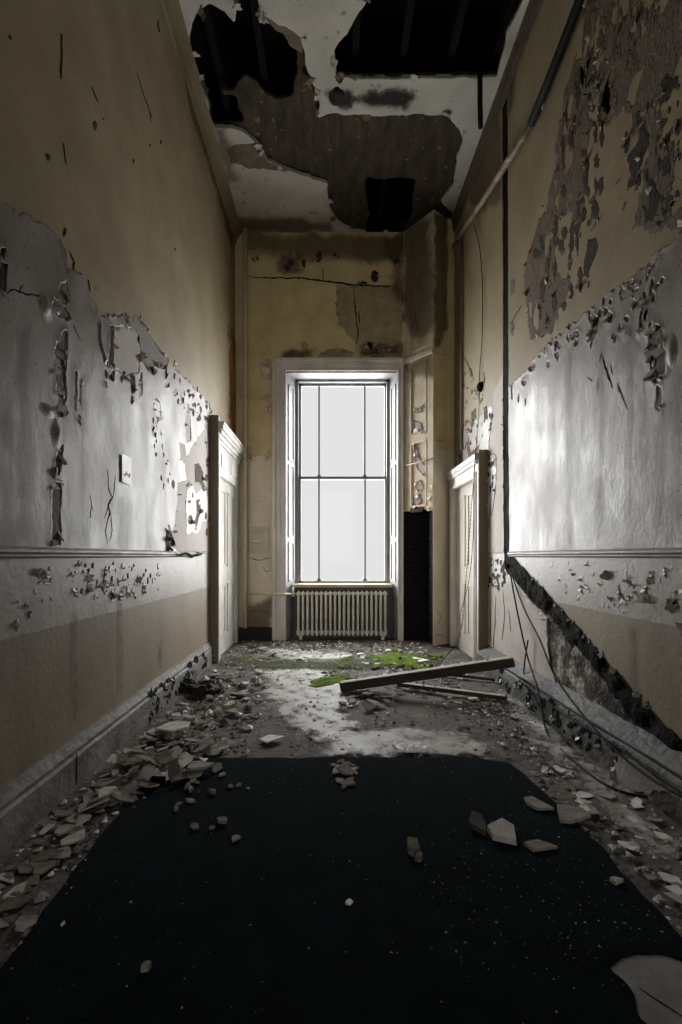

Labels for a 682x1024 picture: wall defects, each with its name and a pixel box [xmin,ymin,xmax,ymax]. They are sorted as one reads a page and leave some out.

spalling [199,0,522,230]
peeling [0,248,15,300]
peeling [52,240,83,425]
water stain [184,75,448,376]
crack [249,268,394,348]
peeling [459,0,682,683]
peeling [52,445,68,547]
crack [90,476,116,543]
peeling [96,312,213,552]
peeling [412,403,433,509]
peeling [149,652,208,720]